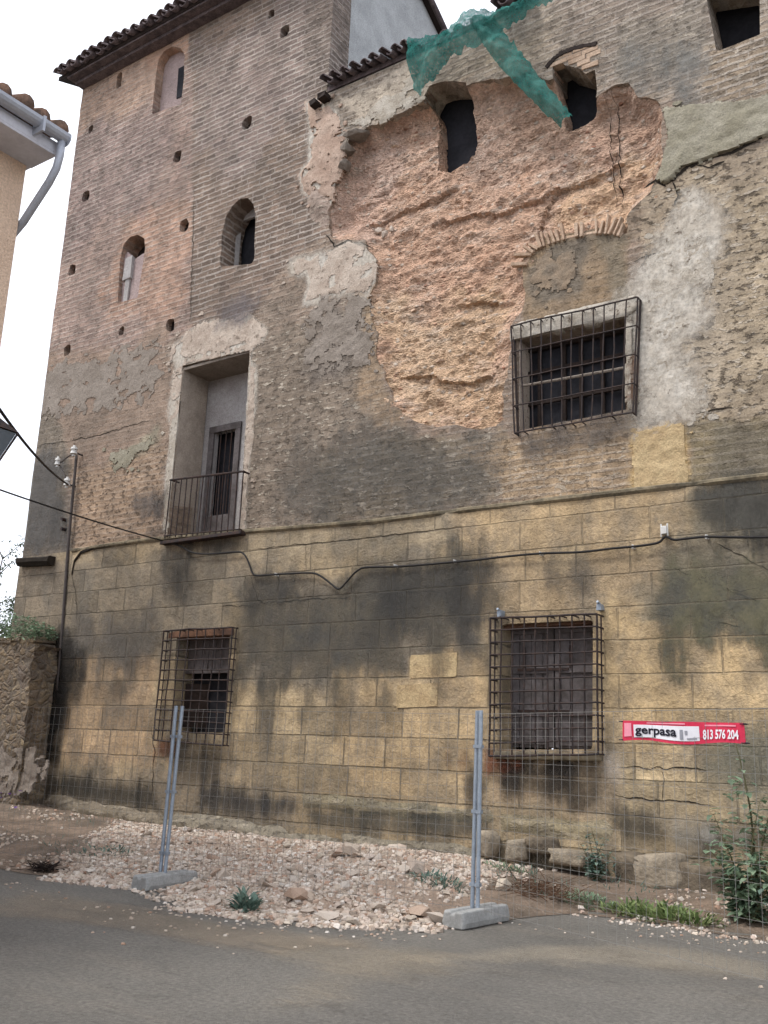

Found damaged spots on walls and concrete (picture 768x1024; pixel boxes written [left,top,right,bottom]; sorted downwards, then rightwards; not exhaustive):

crack [604,90,762,208]
spalling [281,68,723,487]
water stain [199,746,293,813]
water stain [312,770,484,835]
water stain [502,760,585,805]
crack [617,766,714,806]